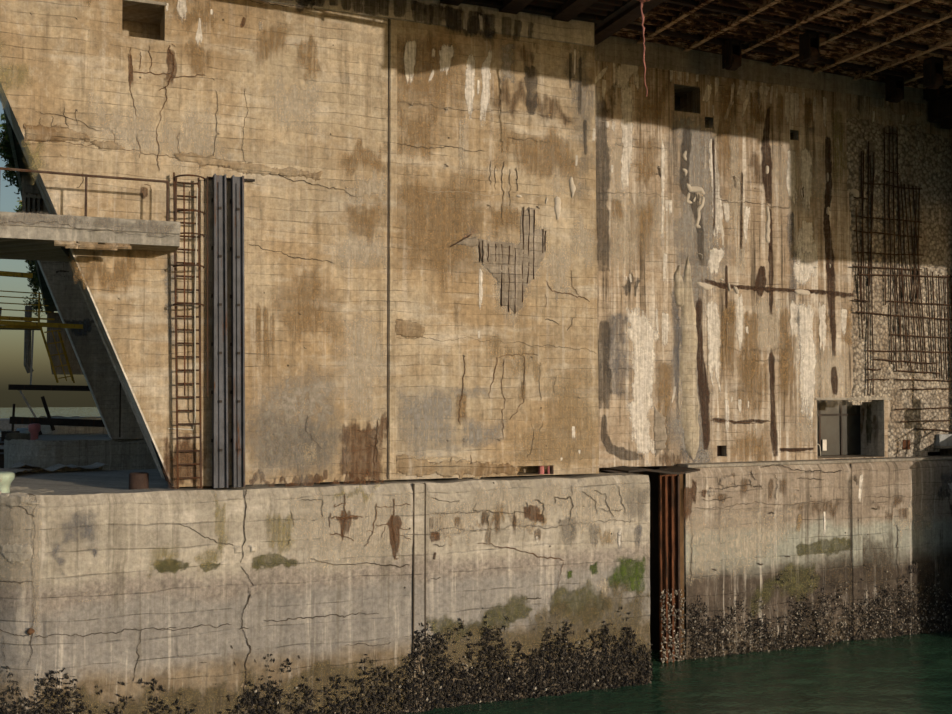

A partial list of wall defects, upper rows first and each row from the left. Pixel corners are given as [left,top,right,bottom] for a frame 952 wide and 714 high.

crack [22,44,249,170]
spalling [450,207,546,320]
leakage [503,49,926,436]
spalling [846,116,952,457]
leakage [598,297,709,463]
crack [0,489,379,694]
rust [337,511,358,536]
crack [288,494,410,568]
rust [387,515,402,559]
rust [513,505,544,539]
crack [433,485,631,599]
leakage [797,474,863,604]